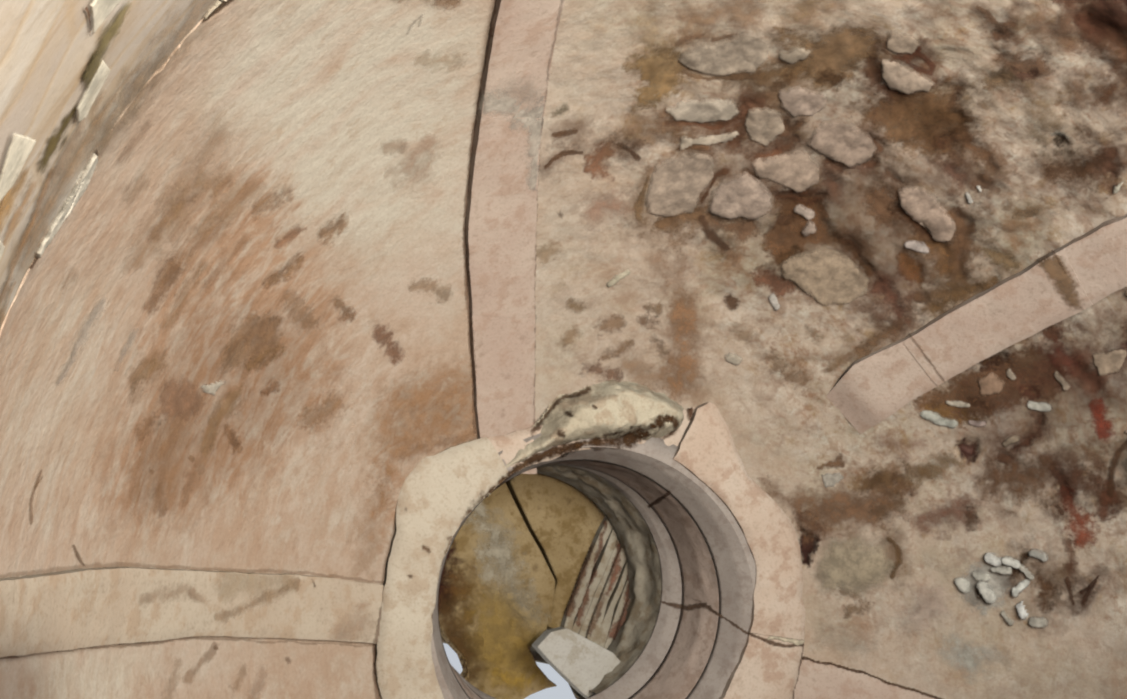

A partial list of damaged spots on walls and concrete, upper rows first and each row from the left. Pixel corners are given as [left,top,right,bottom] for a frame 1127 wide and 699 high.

spalling [1053,0,1127,62]
spalling [985,52,1051,88]
flaking render [29,149,98,269]
spalling [584,140,641,177]
spalling [648,26,1019,355]
spalling [1044,148,1124,193]
spalling [915,327,1127,513]
spalling [818,456,845,488]
spalling [797,513,826,566]
crack [660,601,942,699]